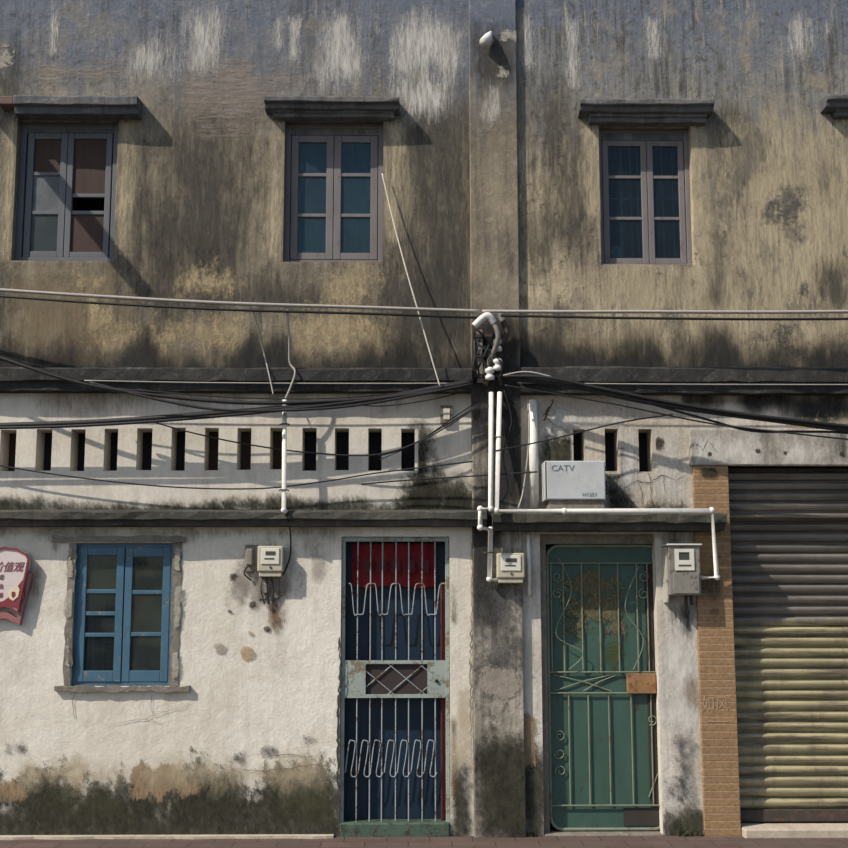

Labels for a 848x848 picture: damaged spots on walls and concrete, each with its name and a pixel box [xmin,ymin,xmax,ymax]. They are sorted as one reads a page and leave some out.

spalling [0,43,15,75]
damp [185,11,221,71]
damp [315,16,361,83]
damp [472,18,534,121]
damp [386,15,460,239]
damp [2,120,14,259]
damp [762,187,807,242]
damp [364,276,470,351]
crack [626,471,686,507]
peeling [0,777,28,805]
peeling [129,759,201,804]
damp [669,737,693,801]